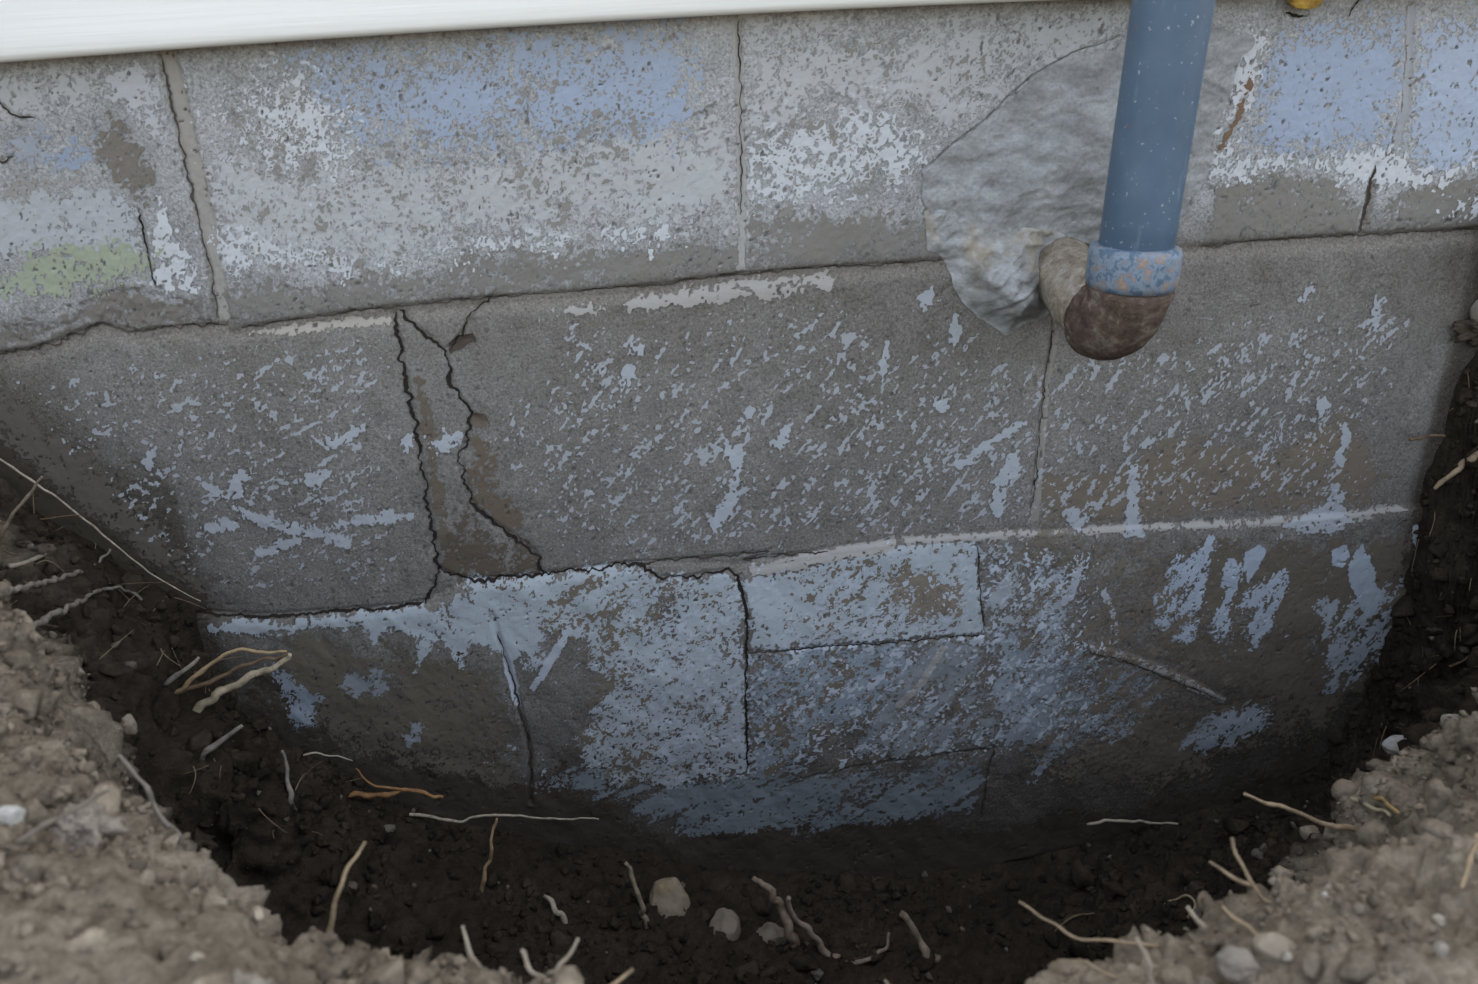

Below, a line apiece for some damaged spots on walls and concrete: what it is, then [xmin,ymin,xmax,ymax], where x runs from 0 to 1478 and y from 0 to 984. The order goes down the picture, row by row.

crack [0,54,985,768]
crack [497,634,533,799]
peeling [0,0,1130,599]
crack [736,21,744,214]
peeling [204,281,1410,838]
crack [787,747,995,819]